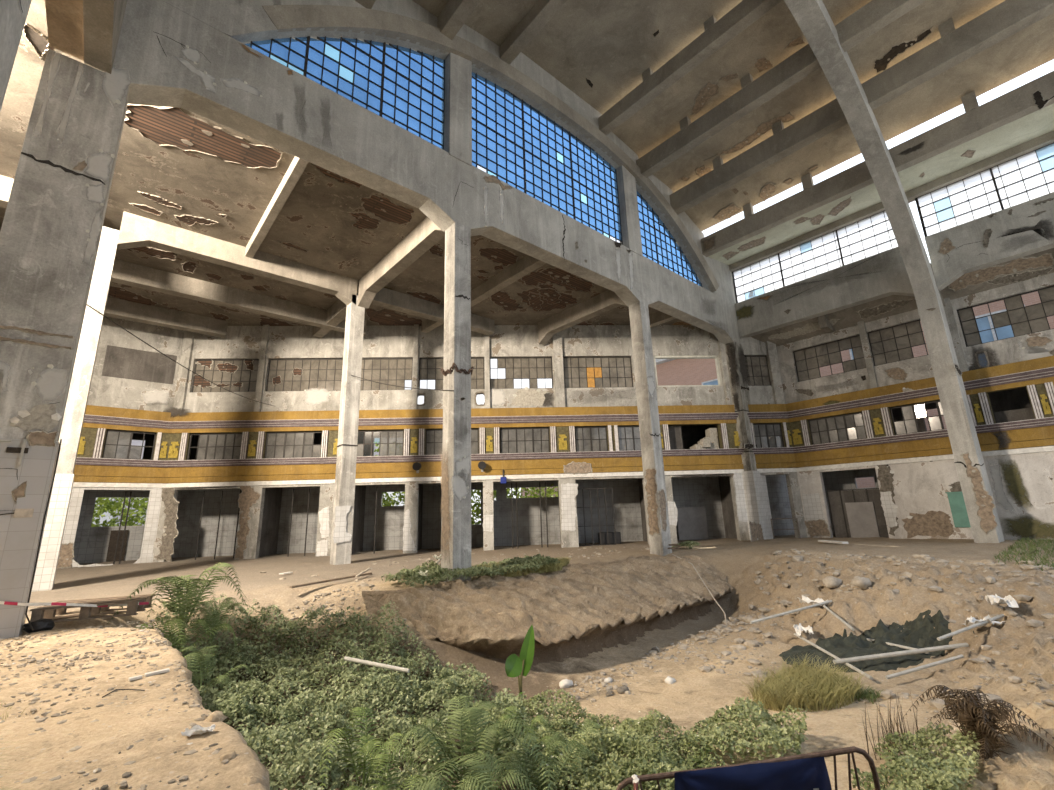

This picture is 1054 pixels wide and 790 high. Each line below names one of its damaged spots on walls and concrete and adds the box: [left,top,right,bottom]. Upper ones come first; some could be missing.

spalling [872,26,933,74]
spalling [103,68,283,168]
crack [21,152,105,185]
spalling [311,163,415,230]
peeling [1026,198,1054,218]
spalling [490,267,595,313]
spalling [948,253,1054,292]
spalling [0,325,75,350]
spalling [156,488,180,562]
spalling [234,486,261,559]
peeling [875,464,954,538]
spalling [947,452,998,535]